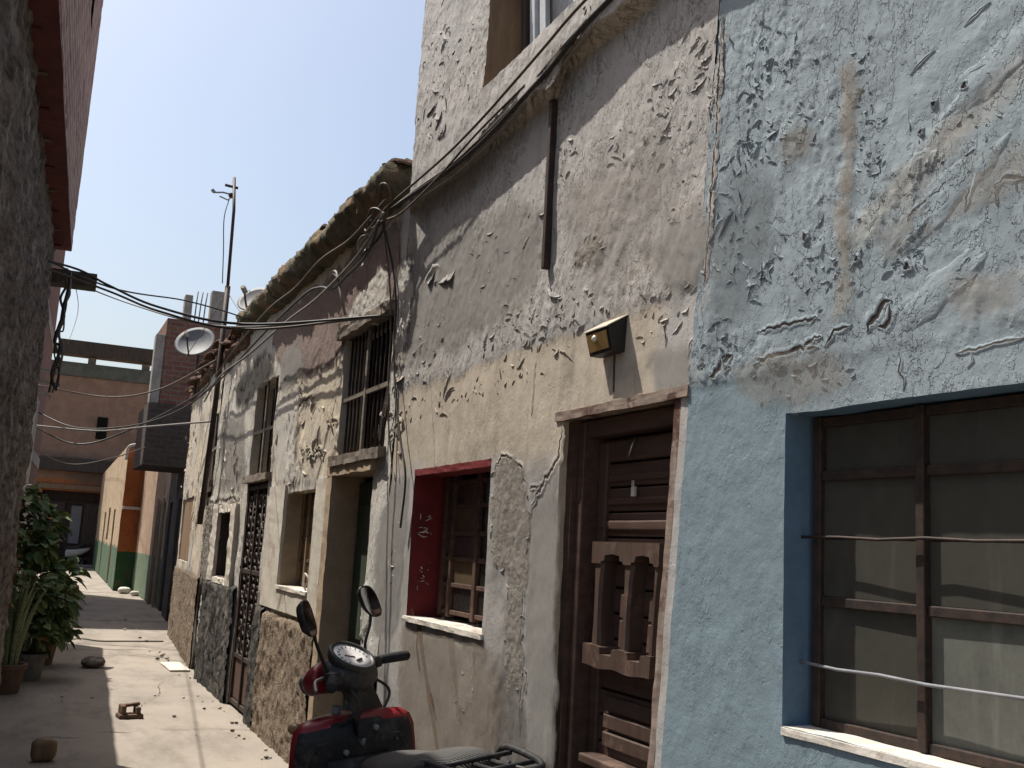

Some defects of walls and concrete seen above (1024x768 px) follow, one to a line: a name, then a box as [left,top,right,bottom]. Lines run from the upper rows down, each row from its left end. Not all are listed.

peeling [417,21,475,146]
peeling [555,128,578,195]
crack [702,15,725,307]
peeling [636,20,824,348]
peeling [838,52,886,176]
spalling [194,291,208,323]
peeling [272,221,606,488]
peeling [697,317,737,373]
crack [685,257,970,390]
peeling [804,215,869,297]
crack [955,336,1024,368]
spalling [200,501,221,586]